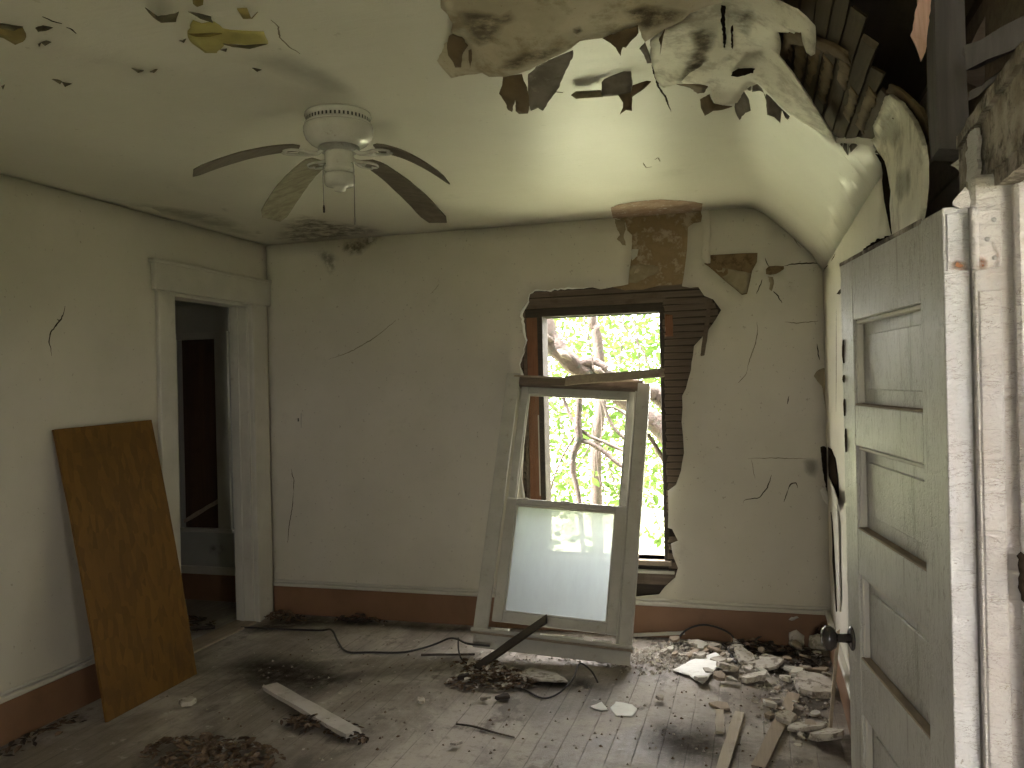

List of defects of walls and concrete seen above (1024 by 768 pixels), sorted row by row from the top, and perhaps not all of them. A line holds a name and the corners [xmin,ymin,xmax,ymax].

peeling [0,23,53,46]
peeling [145,0,268,53]
flaking render [571,0,858,155]
flaking render [705,253,784,295]
crack [756,239,835,360]
crack [48,308,65,356]
flaking render [519,199,718,512]
crack [743,457,806,502]
flaking render [820,429,847,612]
flaking render [668,537,678,581]